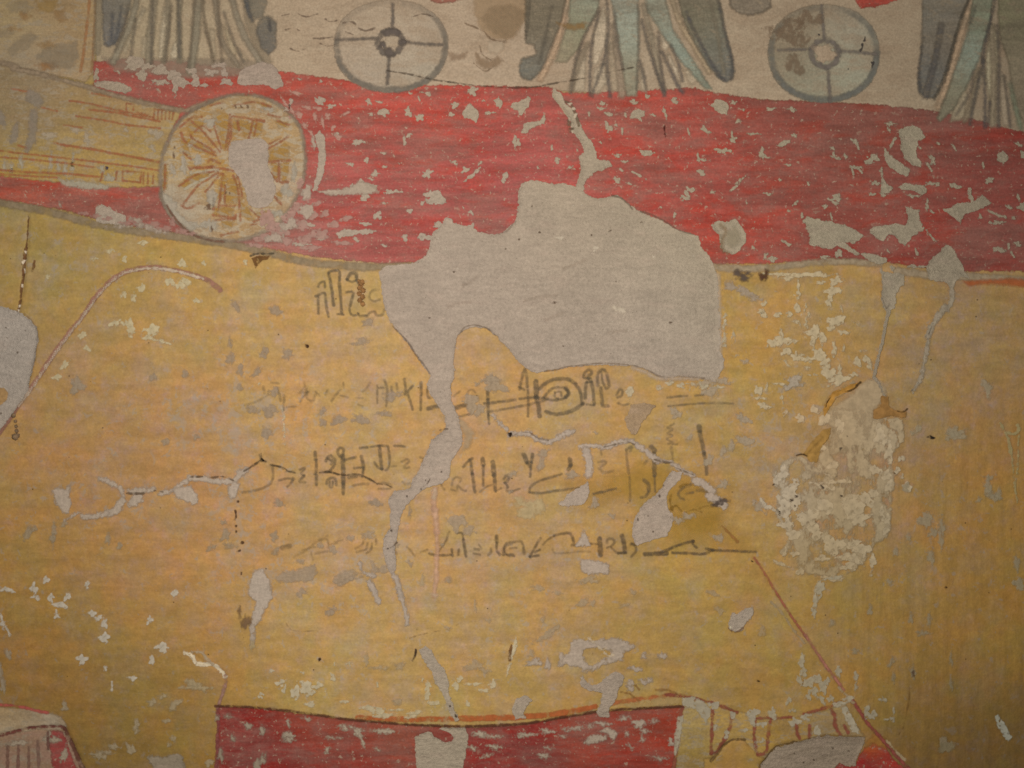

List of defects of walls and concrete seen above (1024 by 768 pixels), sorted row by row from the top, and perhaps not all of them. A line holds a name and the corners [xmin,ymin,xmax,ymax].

flaking render [78,56,403,266]
flaking render [0,306,39,428]
peeling [108,318,174,345]
flaking render [333,86,1024,618]
crack [911,285,955,394]
crack [491,414,728,510]
flaking render [248,559,316,649]
peeling [282,719,296,743]
peeling [269,662,350,722]
flaking render [324,646,504,768]
flaking render [517,618,667,759]
flaking render [760,734,865,768]